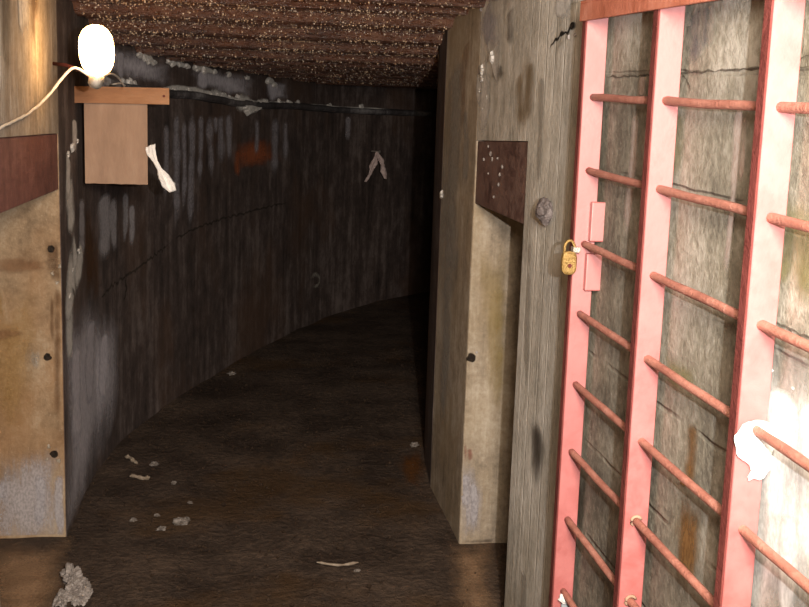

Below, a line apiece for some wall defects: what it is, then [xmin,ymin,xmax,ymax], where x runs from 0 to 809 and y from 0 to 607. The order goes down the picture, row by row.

crack [550,22,577,47]
leakage [164,117,231,217]
leakage [100,194,134,255]
leakage [66,120,114,500]
leakage [0,465,64,533]